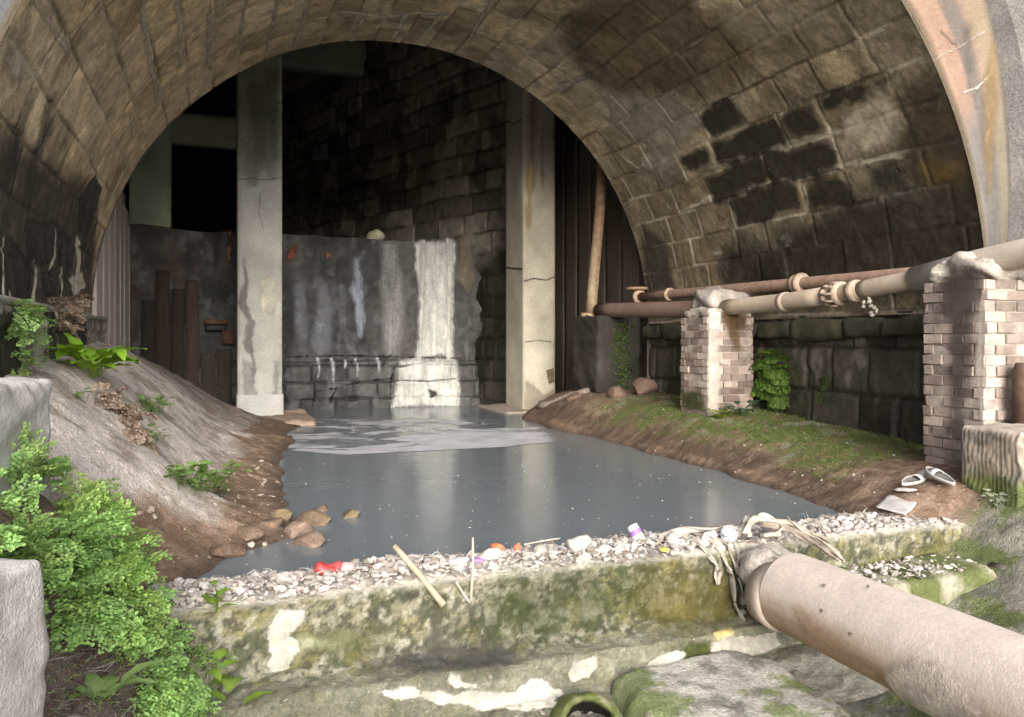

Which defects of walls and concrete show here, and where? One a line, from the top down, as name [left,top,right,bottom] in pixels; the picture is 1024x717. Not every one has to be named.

leakage [0,99,118,378]
leakage [350,258,365,338]
leakage [381,238,460,408]
leakage [643,75,984,440]
peeling [267,608,352,672]
peeling [381,656,598,712]